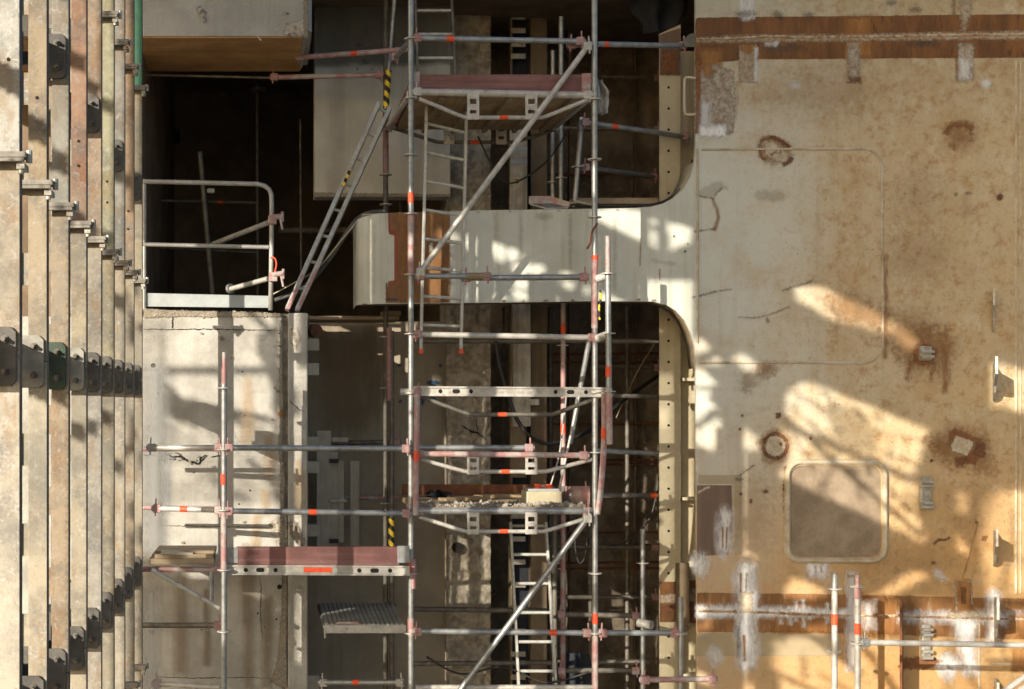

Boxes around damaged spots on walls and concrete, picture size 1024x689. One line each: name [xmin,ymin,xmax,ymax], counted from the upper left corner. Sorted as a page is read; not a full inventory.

corrosion [695,14,1024,134]
corrosion [758,135,793,167]
crack [143,453,220,465]
corrosion [762,432,789,472]
corrosion [949,428,986,466]